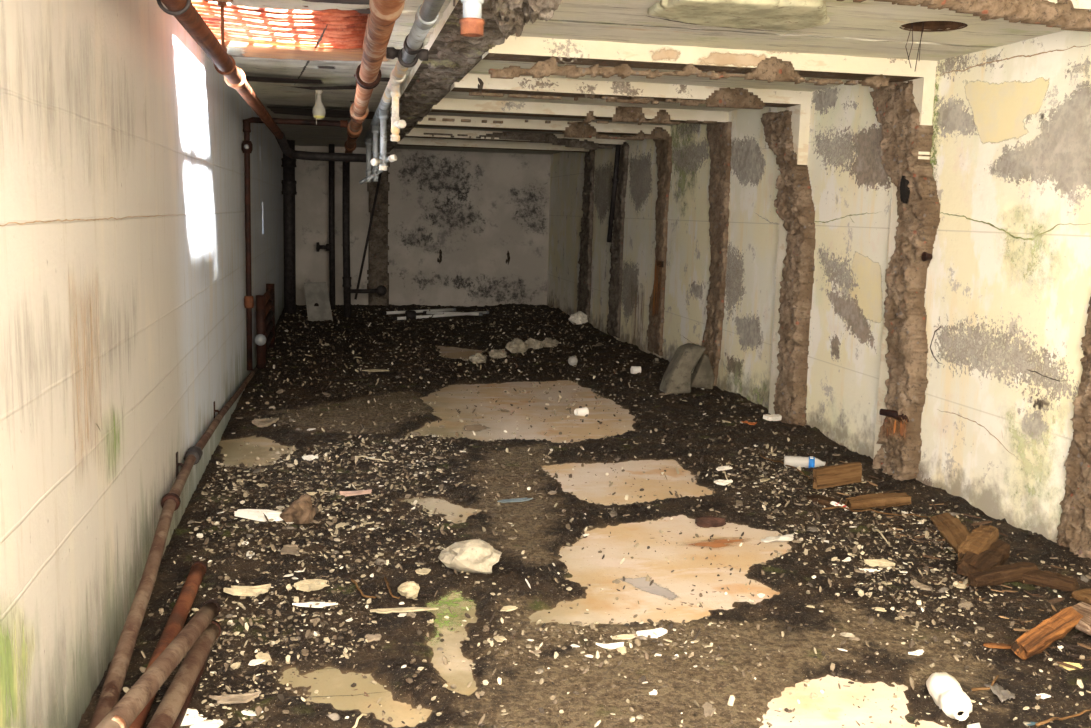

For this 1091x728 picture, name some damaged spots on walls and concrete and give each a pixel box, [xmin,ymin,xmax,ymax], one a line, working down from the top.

spalling [836,0,1091,32]
leakage [399,153,485,253]
crack [941,212,1091,241]
leakage [414,271,534,303]
spalling [424,38,1091,559]